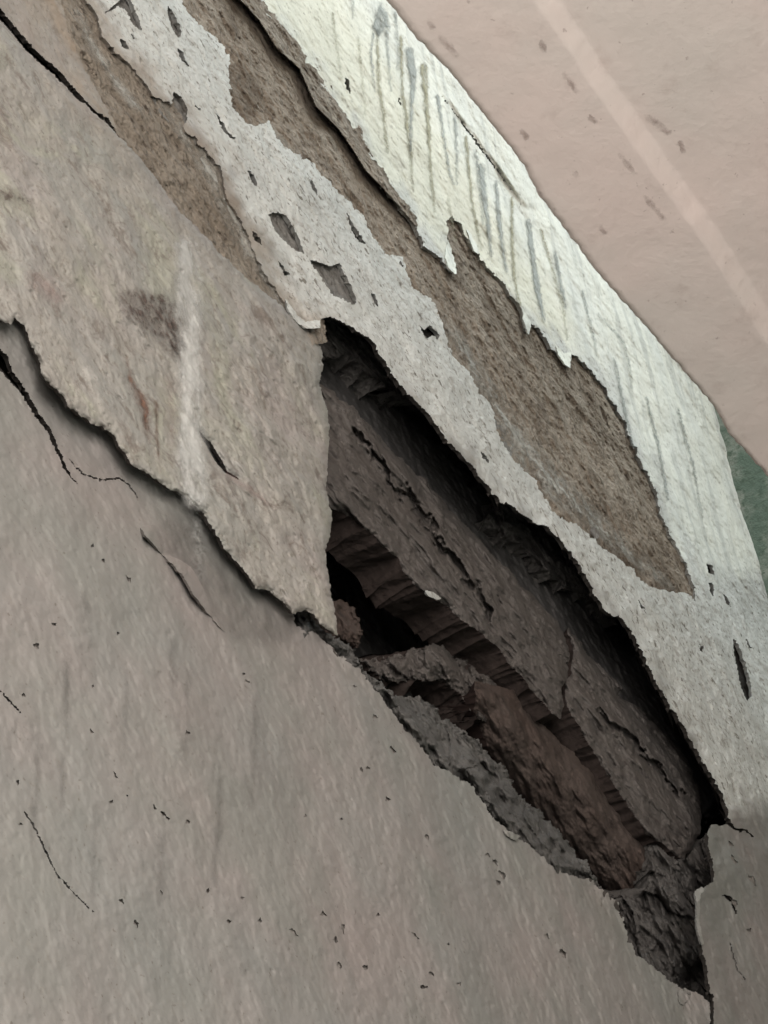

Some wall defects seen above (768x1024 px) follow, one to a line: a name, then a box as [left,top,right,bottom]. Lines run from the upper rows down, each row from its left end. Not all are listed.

crack [0,355,63,468]
crack [0,17,116,133]
flaking render [61,0,283,306]
flaking render [182,0,693,598]
leakage [360,5,521,304]
leakage [526,219,566,320]
flaking render [140,524,225,632]
spalling [285,299,735,1005]